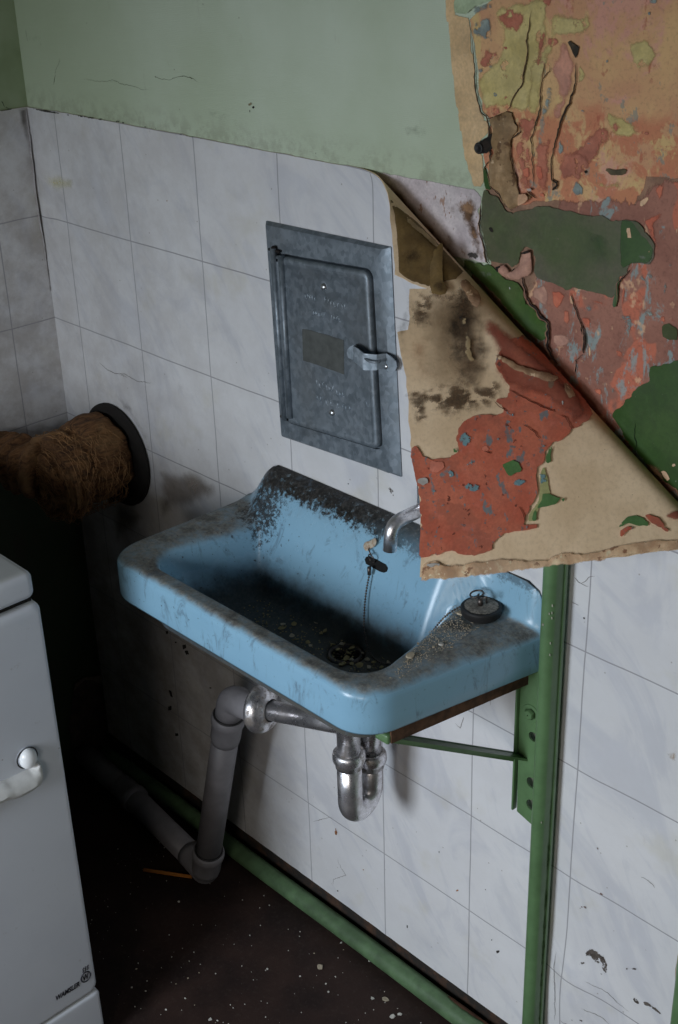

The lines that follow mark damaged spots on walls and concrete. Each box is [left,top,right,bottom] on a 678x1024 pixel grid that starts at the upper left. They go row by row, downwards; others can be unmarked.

leakage [411,383,497,421]
crack [469,13,576,264]
peeling [376,0,678,502]
leakage [497,355,575,398]